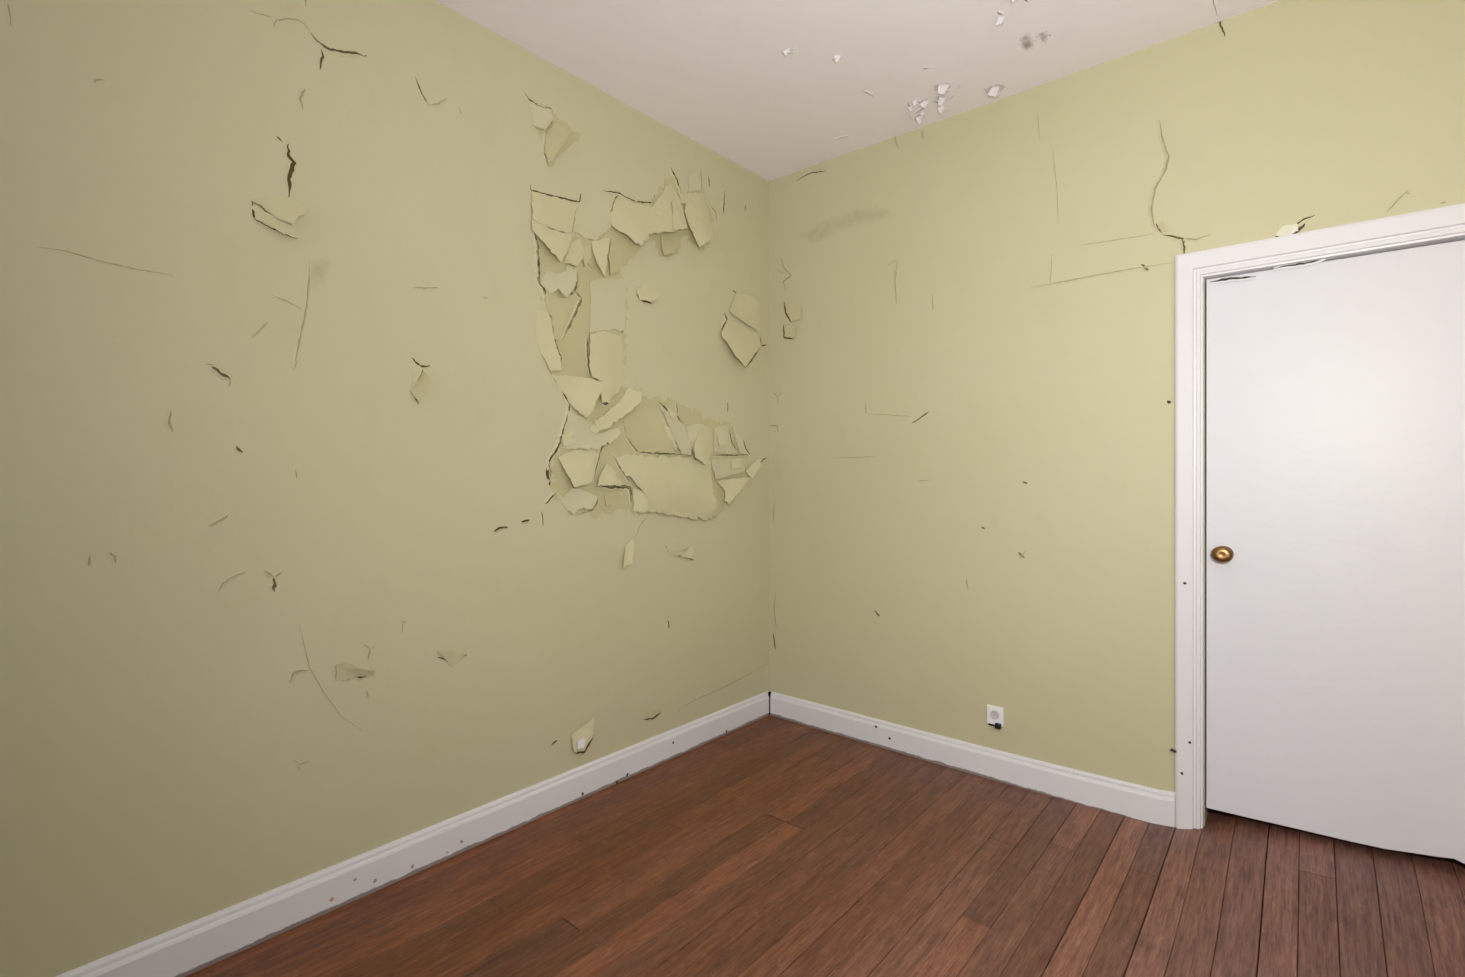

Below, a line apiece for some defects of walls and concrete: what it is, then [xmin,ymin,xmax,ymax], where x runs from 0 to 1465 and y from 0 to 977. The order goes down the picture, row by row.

crack [249,0,368,110]
crack [1212,0,1227,38]
peeling [522,91,581,167]
peeling [906,83,961,124]
peeling [248,135,308,241]
crack [1029,111,1212,290]
crack [1210,259,1326,284]
peeling [408,357,431,405]
peeling [493,167,767,568]
peeling [551,715,595,756]